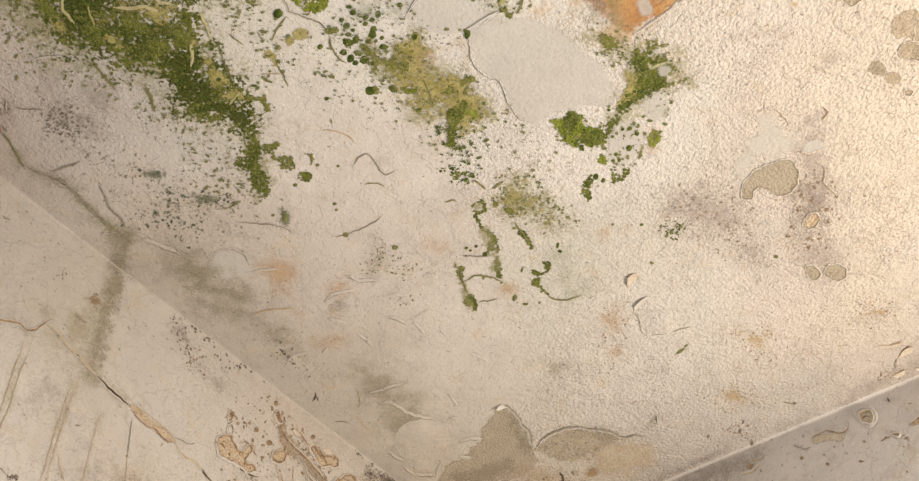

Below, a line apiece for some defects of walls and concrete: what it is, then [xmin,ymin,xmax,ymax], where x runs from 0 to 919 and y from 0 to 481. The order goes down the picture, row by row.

peeling [892,9,919,62]
damp [291,0,462,130]
damp [25,86,243,252]
damp [437,151,486,189]
damp [360,238,417,281]
crack [0,318,133,478]
crack [175,442,213,481]
peeling [215,396,357,481]
damp [355,450,395,481]